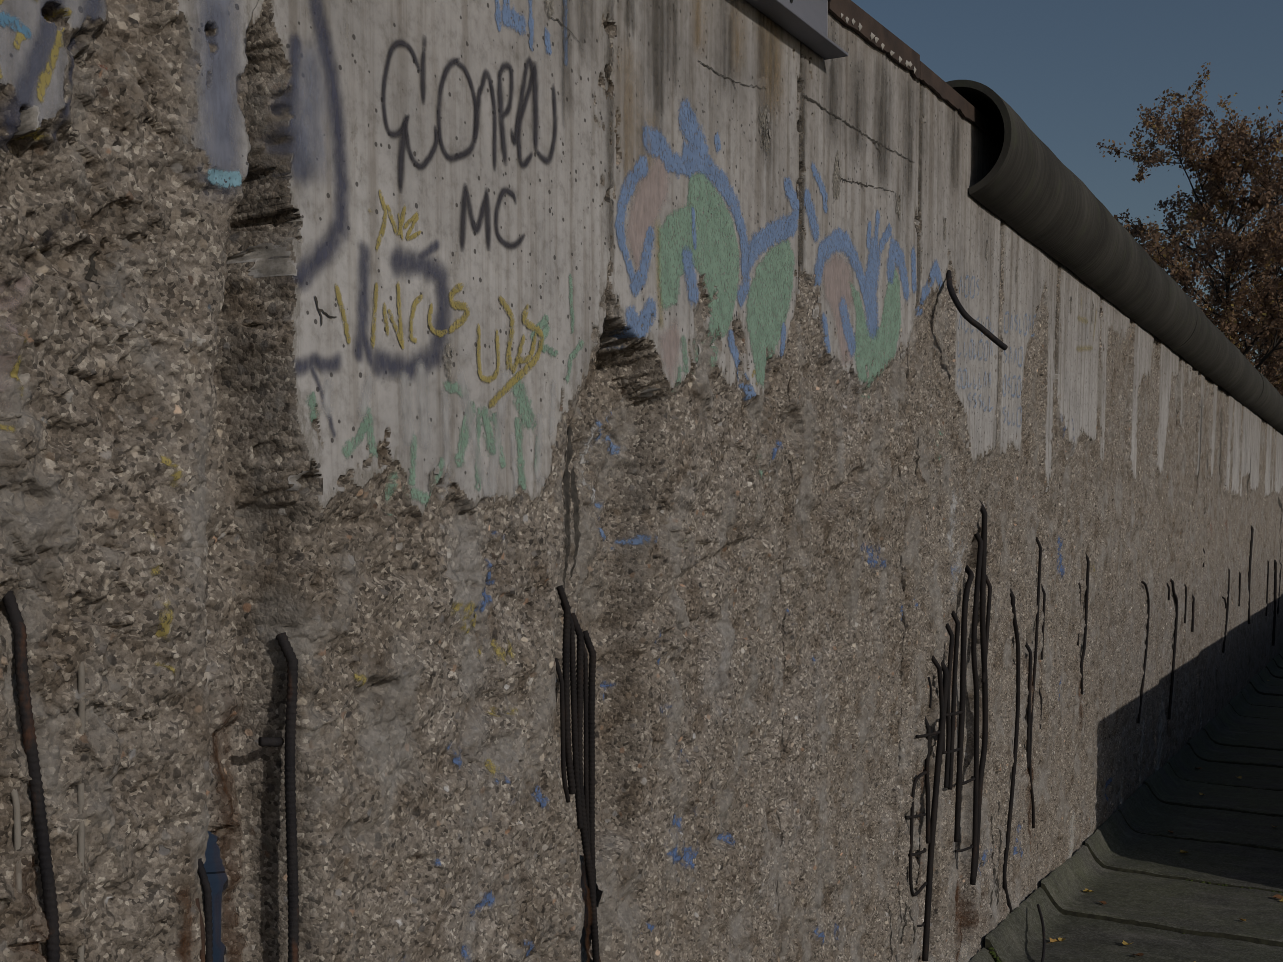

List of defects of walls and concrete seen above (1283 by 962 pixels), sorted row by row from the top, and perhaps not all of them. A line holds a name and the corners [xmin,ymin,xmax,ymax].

spalling [594,10,622,205]
spalling [792,49,813,245]
spalling [914,136,923,262]
spalling [0,0,601,962]
spalling [564,219,1283,962]